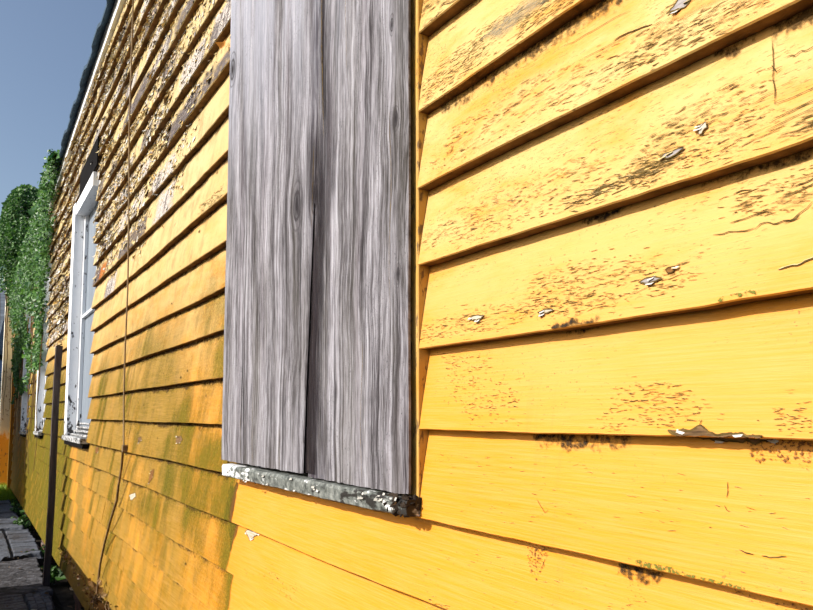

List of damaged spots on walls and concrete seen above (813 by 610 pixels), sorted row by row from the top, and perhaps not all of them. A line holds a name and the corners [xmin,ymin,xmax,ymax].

peeling [666,0,690,15]
crack [420,0,774,174]
peeling [43,0,231,348]
water stain [100,115,229,263]
crack [422,43,813,248]
water stain [94,247,226,333]
water stain [95,201,227,310]
peeling [638,266,679,285]
crack [778,257,813,270]
water stain [21,291,238,610]
water stain [533,434,630,452]
peeling [667,424,778,444]